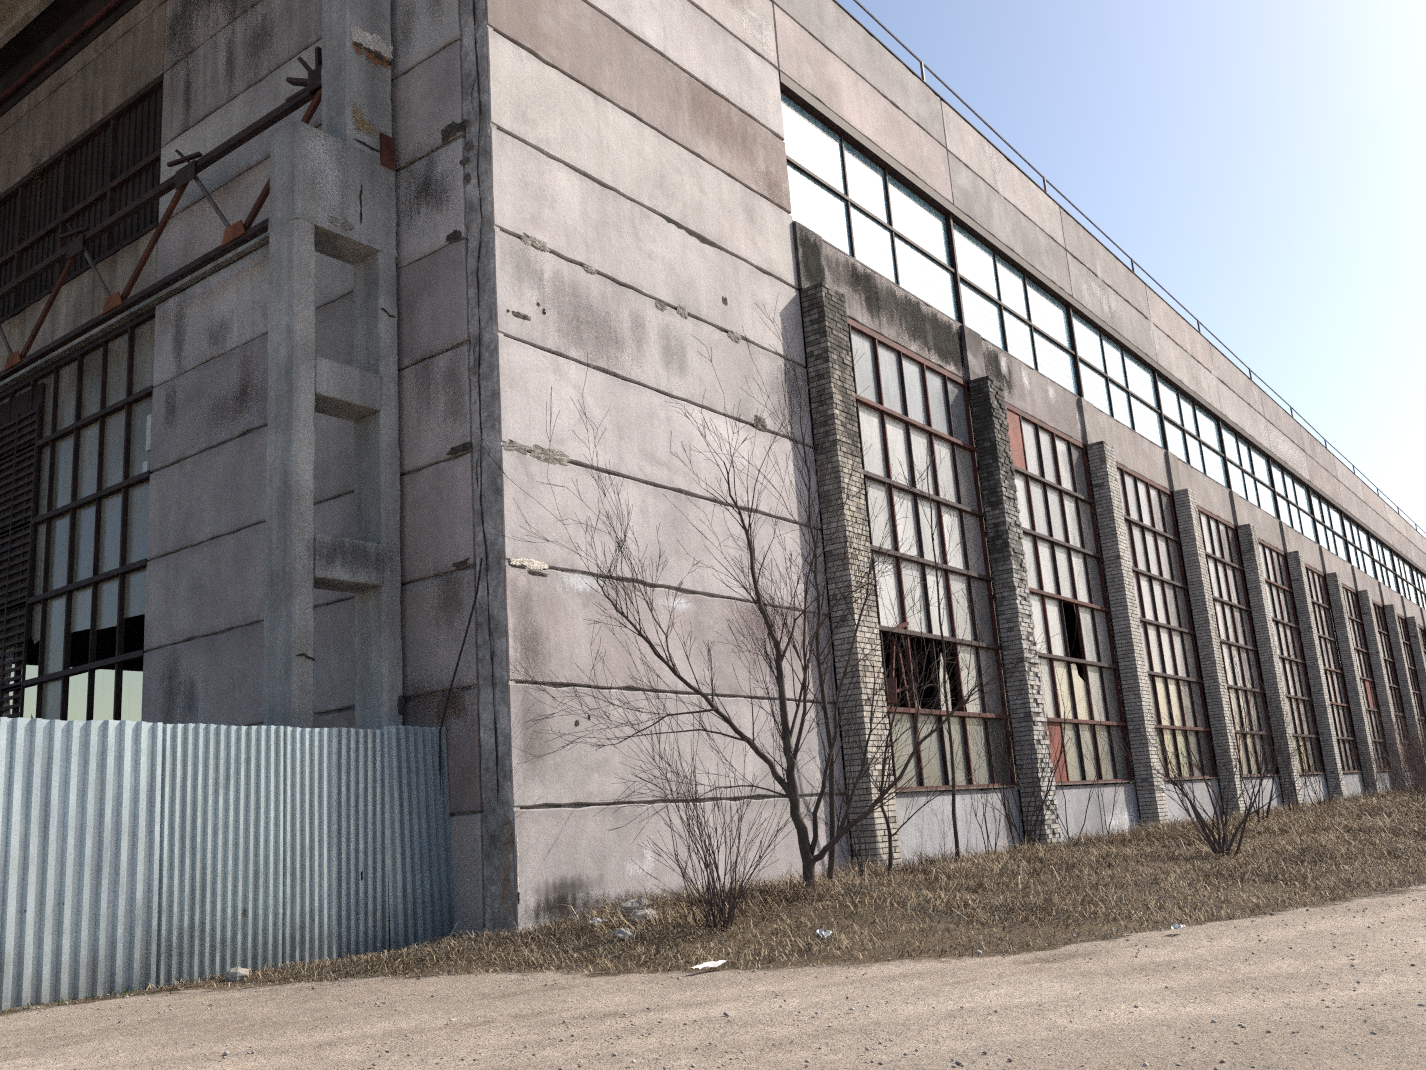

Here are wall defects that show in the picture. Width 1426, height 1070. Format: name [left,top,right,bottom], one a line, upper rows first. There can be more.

spalling [351,25,393,66]
water stain [805,241,965,366]
water stain [983,351,1028,388]
spalling [503,439,570,466]